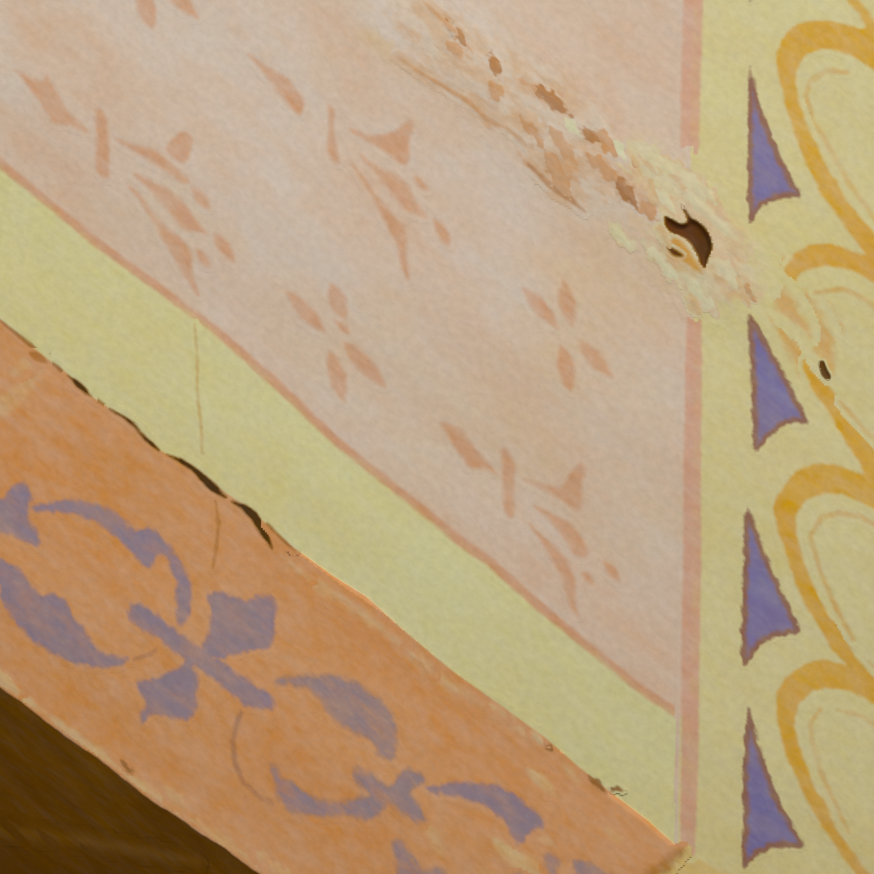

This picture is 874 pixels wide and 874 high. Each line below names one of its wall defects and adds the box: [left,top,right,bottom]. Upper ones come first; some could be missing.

flaking render [372,0,784,329]
crack [0,314,301,574]
spalling [817,359,833,384]